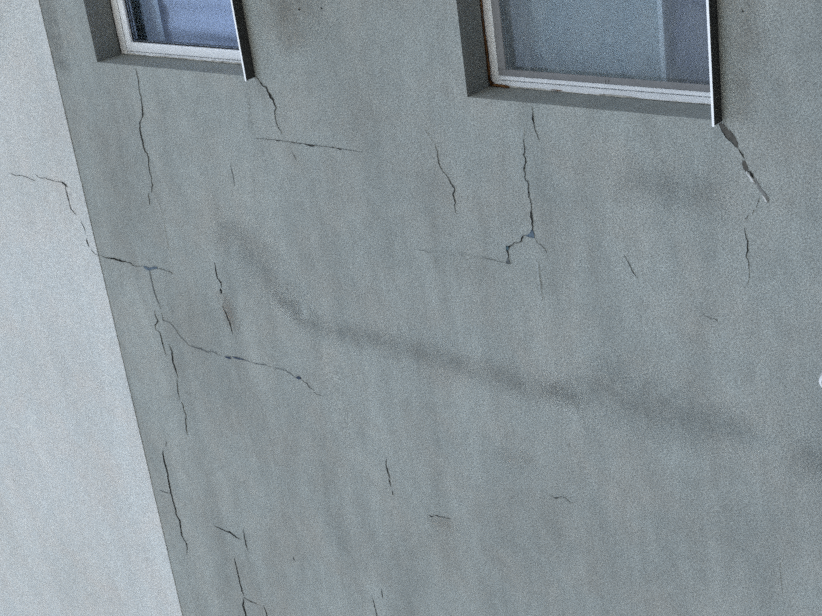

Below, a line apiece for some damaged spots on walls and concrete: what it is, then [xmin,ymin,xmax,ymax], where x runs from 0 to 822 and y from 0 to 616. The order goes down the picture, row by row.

crack [255,76,360,159]
crack [435,144,456,213]
crack [465,106,547,265]
crack [718,122,769,267]
crack [14,175,322,435]
crack [160,444,187,552]